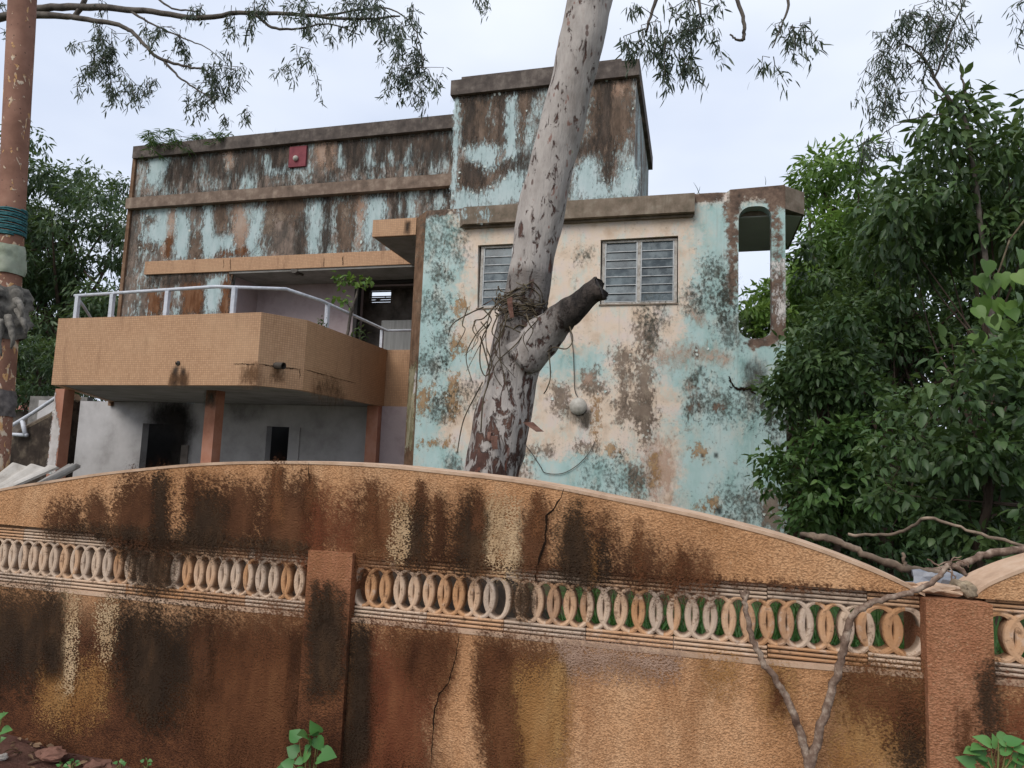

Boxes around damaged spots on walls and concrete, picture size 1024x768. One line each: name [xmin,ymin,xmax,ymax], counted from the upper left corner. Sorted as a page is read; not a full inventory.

water stain [141,145,290,197]
water stain [294,197,335,255]
water stain [503,146,532,175]
peeling [770,259,787,324]
peeling [405,293,471,452]
peeling [518,444,555,479]
peeling [551,346,727,502]
crack [534,489,564,584]
water stain [351,456,895,605]
water stain [41,456,377,768]
crack [431,637,459,761]
water stain [469,626,685,768]